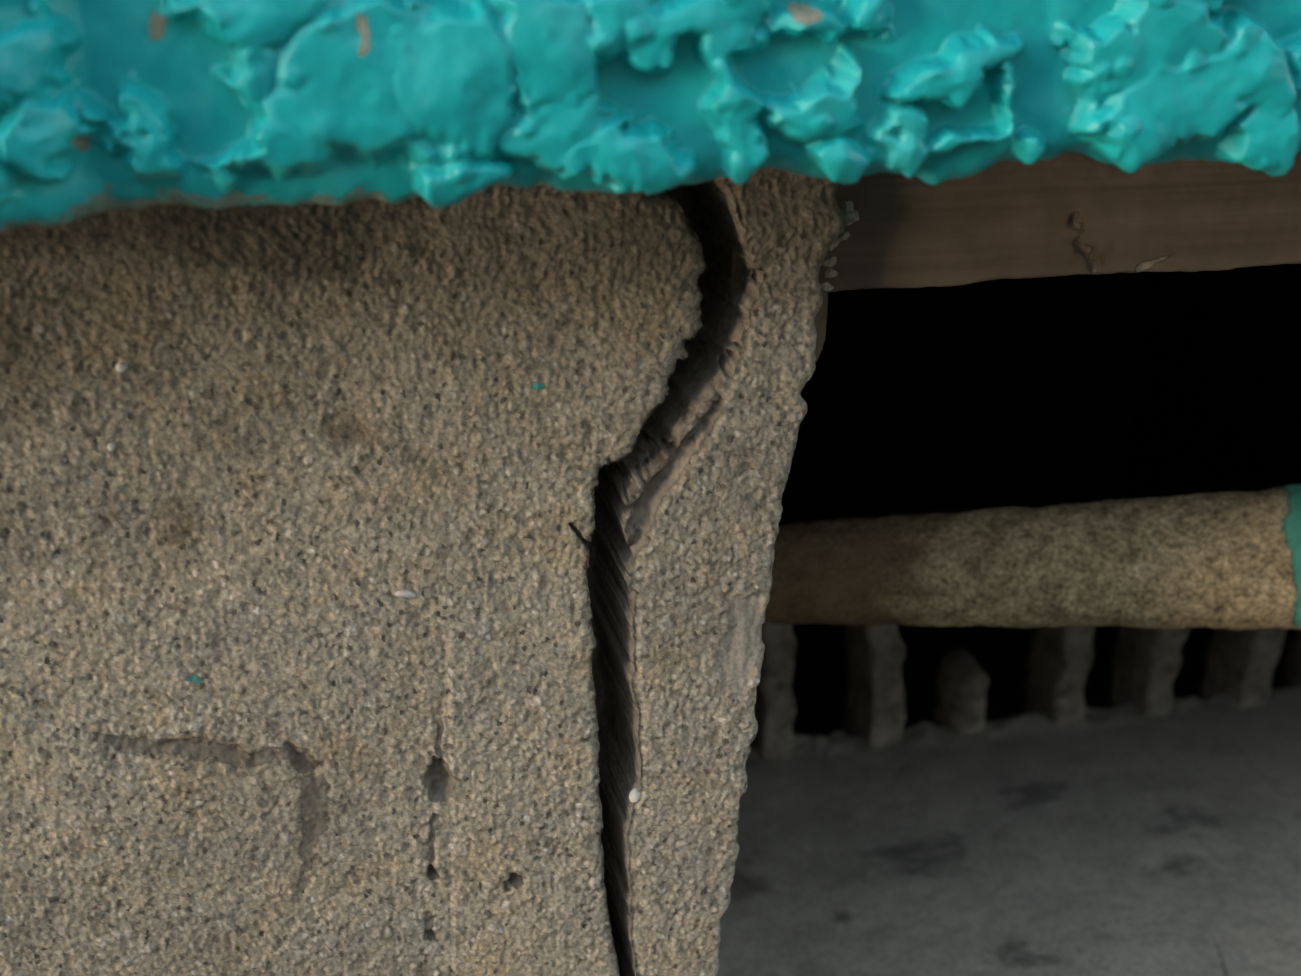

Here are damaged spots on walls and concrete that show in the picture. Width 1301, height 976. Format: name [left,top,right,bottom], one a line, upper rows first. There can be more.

crack [569,178,765,976]